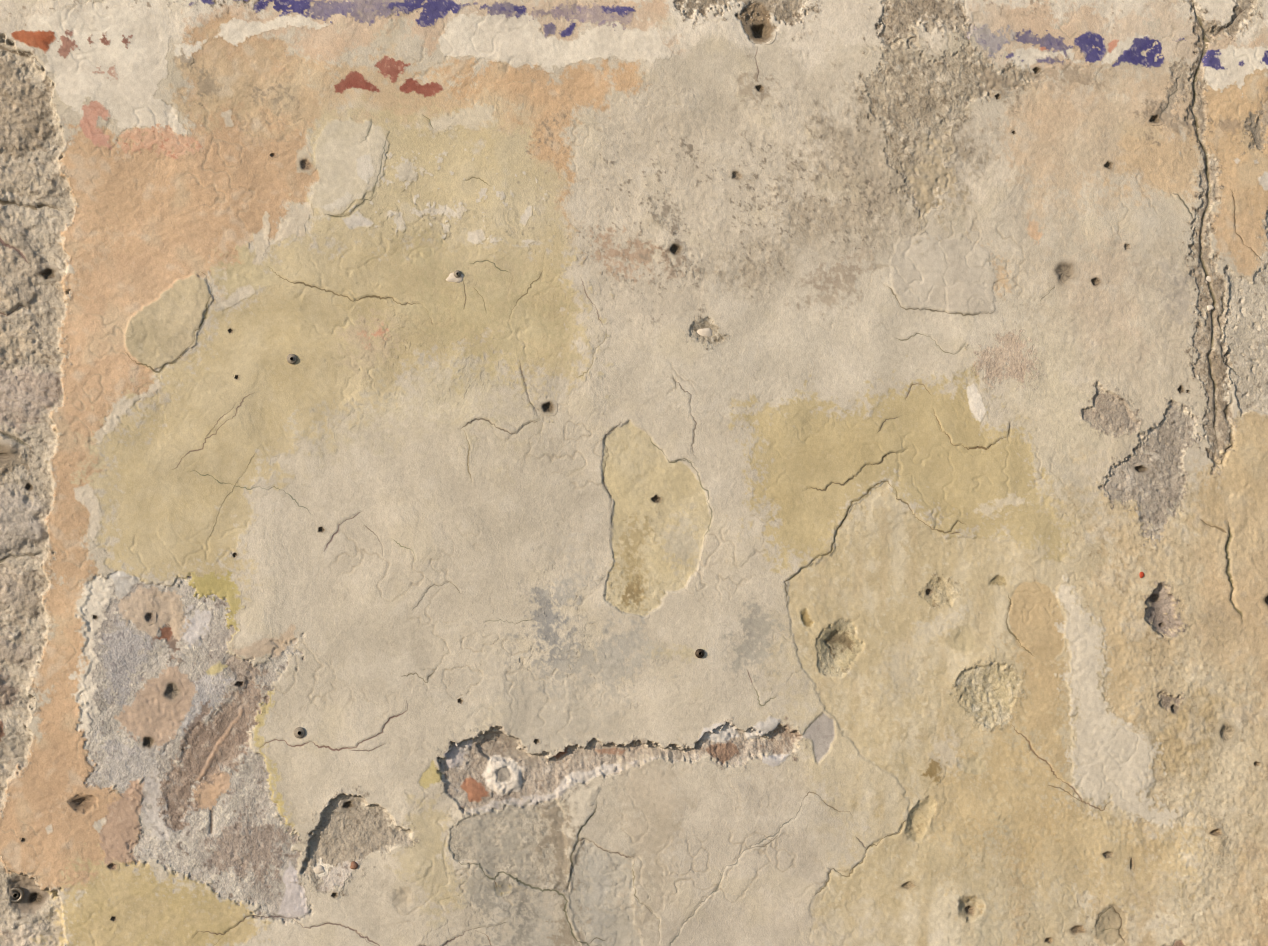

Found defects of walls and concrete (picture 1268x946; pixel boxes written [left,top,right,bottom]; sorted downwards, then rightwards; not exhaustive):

flaking render [672,0,824,41]
flaking render [844,0,1063,218]
crack [267,266,432,323]
crack [1160,0,1264,479]
flaking render [1223,69,1268,424]
crack [169,392,310,539]
peeling [0,32,615,946]
crack [461,361,540,483]
crack [784,383,1010,608]
peeling [601,316,1258,946]
crack [452,791,909,946]
crack [1011,724,1108,811]